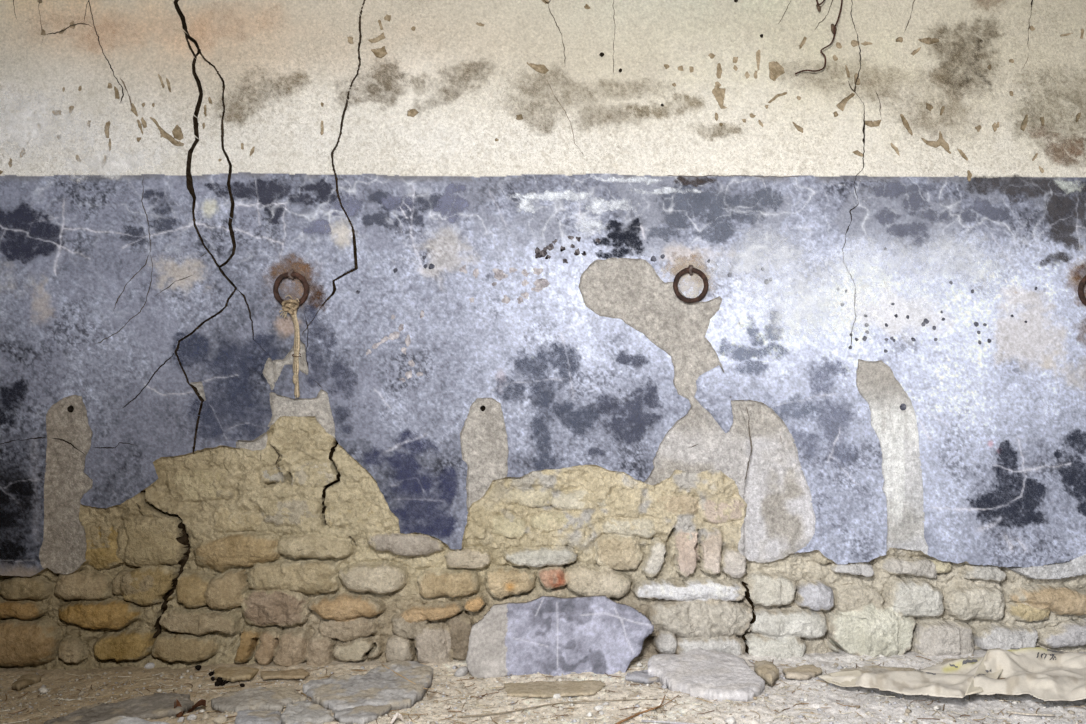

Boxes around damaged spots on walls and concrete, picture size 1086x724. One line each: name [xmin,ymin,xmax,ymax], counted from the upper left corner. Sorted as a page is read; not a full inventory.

crack [13,0,132,107]
leakage [0,203,64,263]
crack [98,0,270,453]
rust [272,257,326,309]
crack [302,0,366,387]
rust [665,255,713,298]
crack [322,440,341,513]
flaking render [0,236,1086,670]
leakage [496,343,661,471]
leakage [967,440,1047,527]
leakage [1054,430,1086,516]
crack [136,490,191,638]